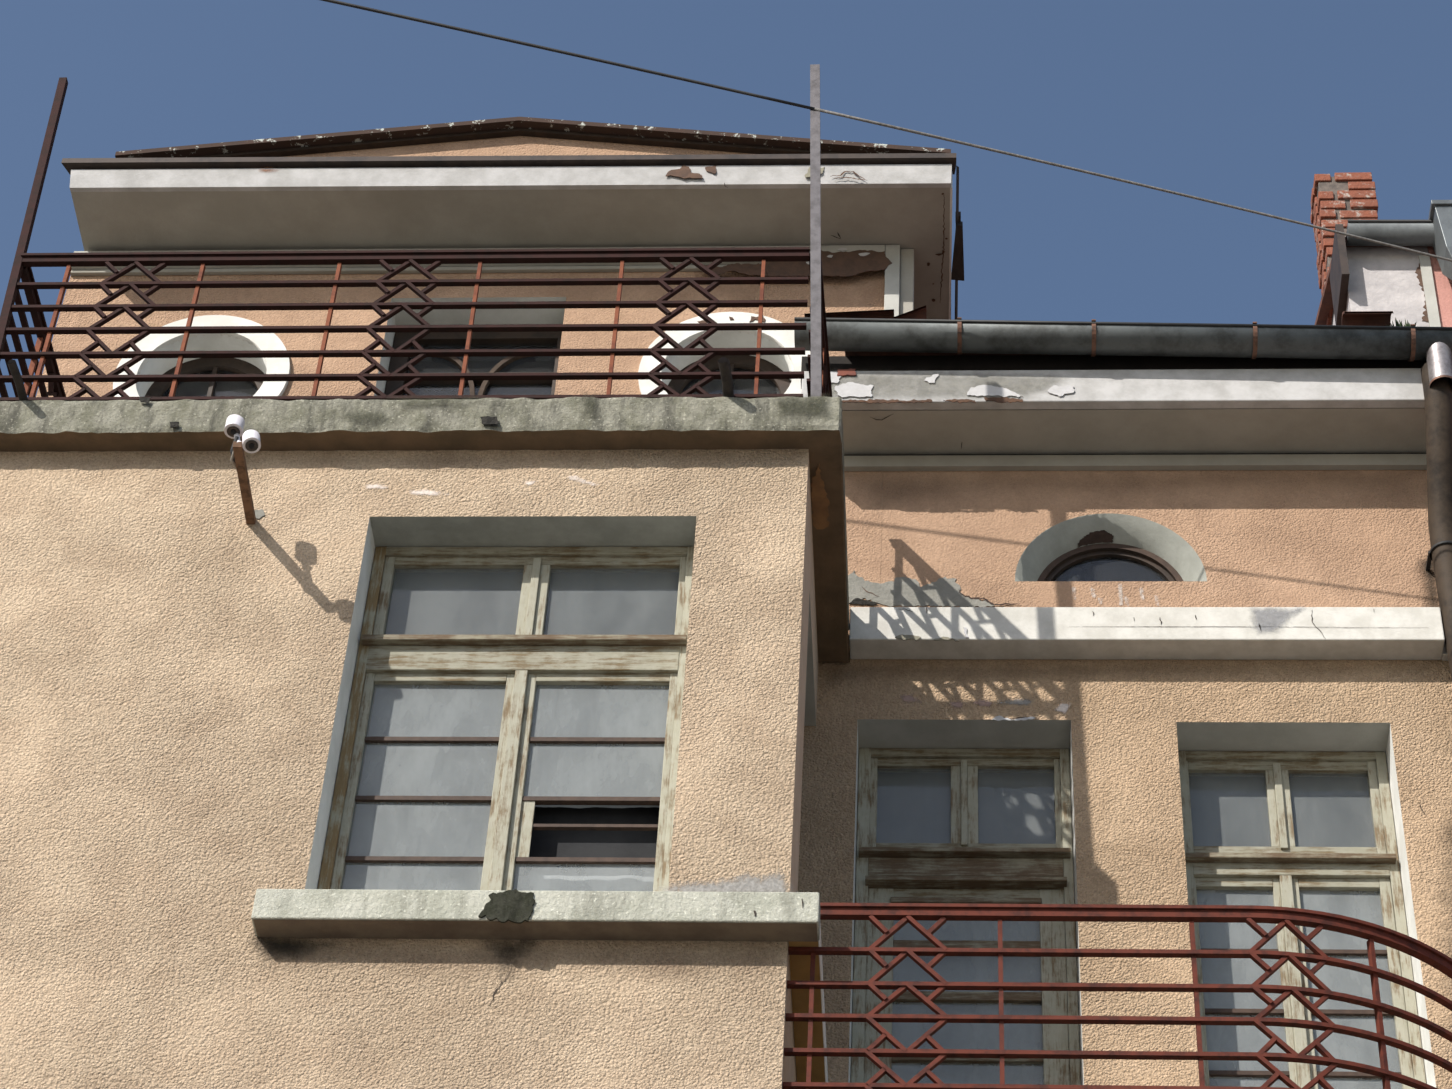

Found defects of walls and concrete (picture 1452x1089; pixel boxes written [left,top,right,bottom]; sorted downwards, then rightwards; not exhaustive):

peeling [666,165,728,188]
peeling [765,248,892,277]
peeling [848,570,1014,613]
spalling [895,627,968,642]